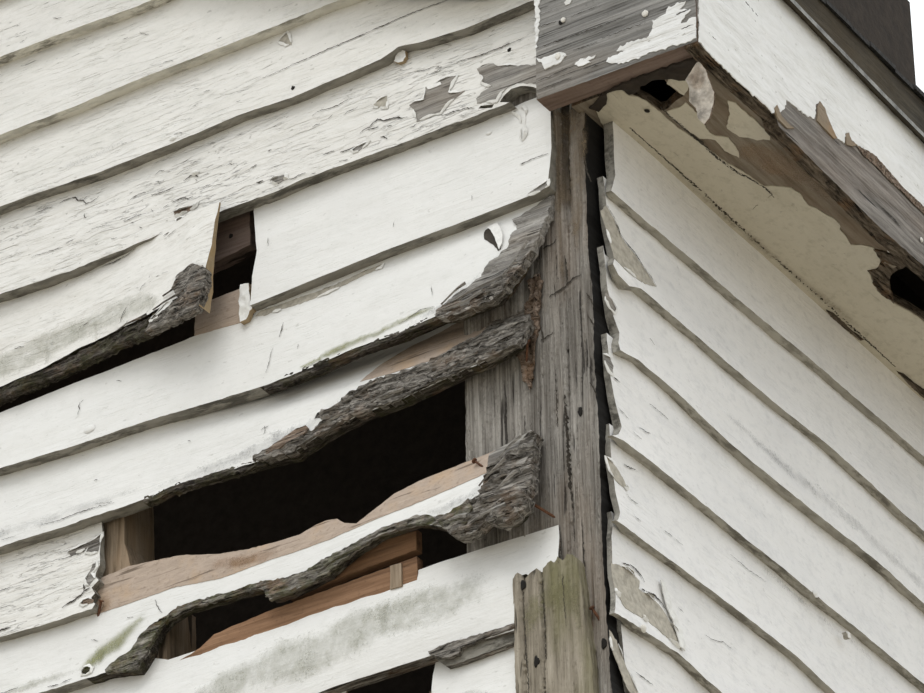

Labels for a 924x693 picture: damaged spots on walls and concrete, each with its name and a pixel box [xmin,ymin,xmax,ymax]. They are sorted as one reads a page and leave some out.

spalling [828,0,916,84]
peeling [409,75,464,122]
peeling [476,63,536,103]
peeling [856,145,924,214]
spalling [212,254,256,299]
peeling [601,206,656,287]
spalling [0,317,195,412]
spalling [153,381,466,560]
spalling [319,528,467,593]
spalling [192,594,293,650]
peeling [611,563,686,651]
spalling [348,664,435,693]